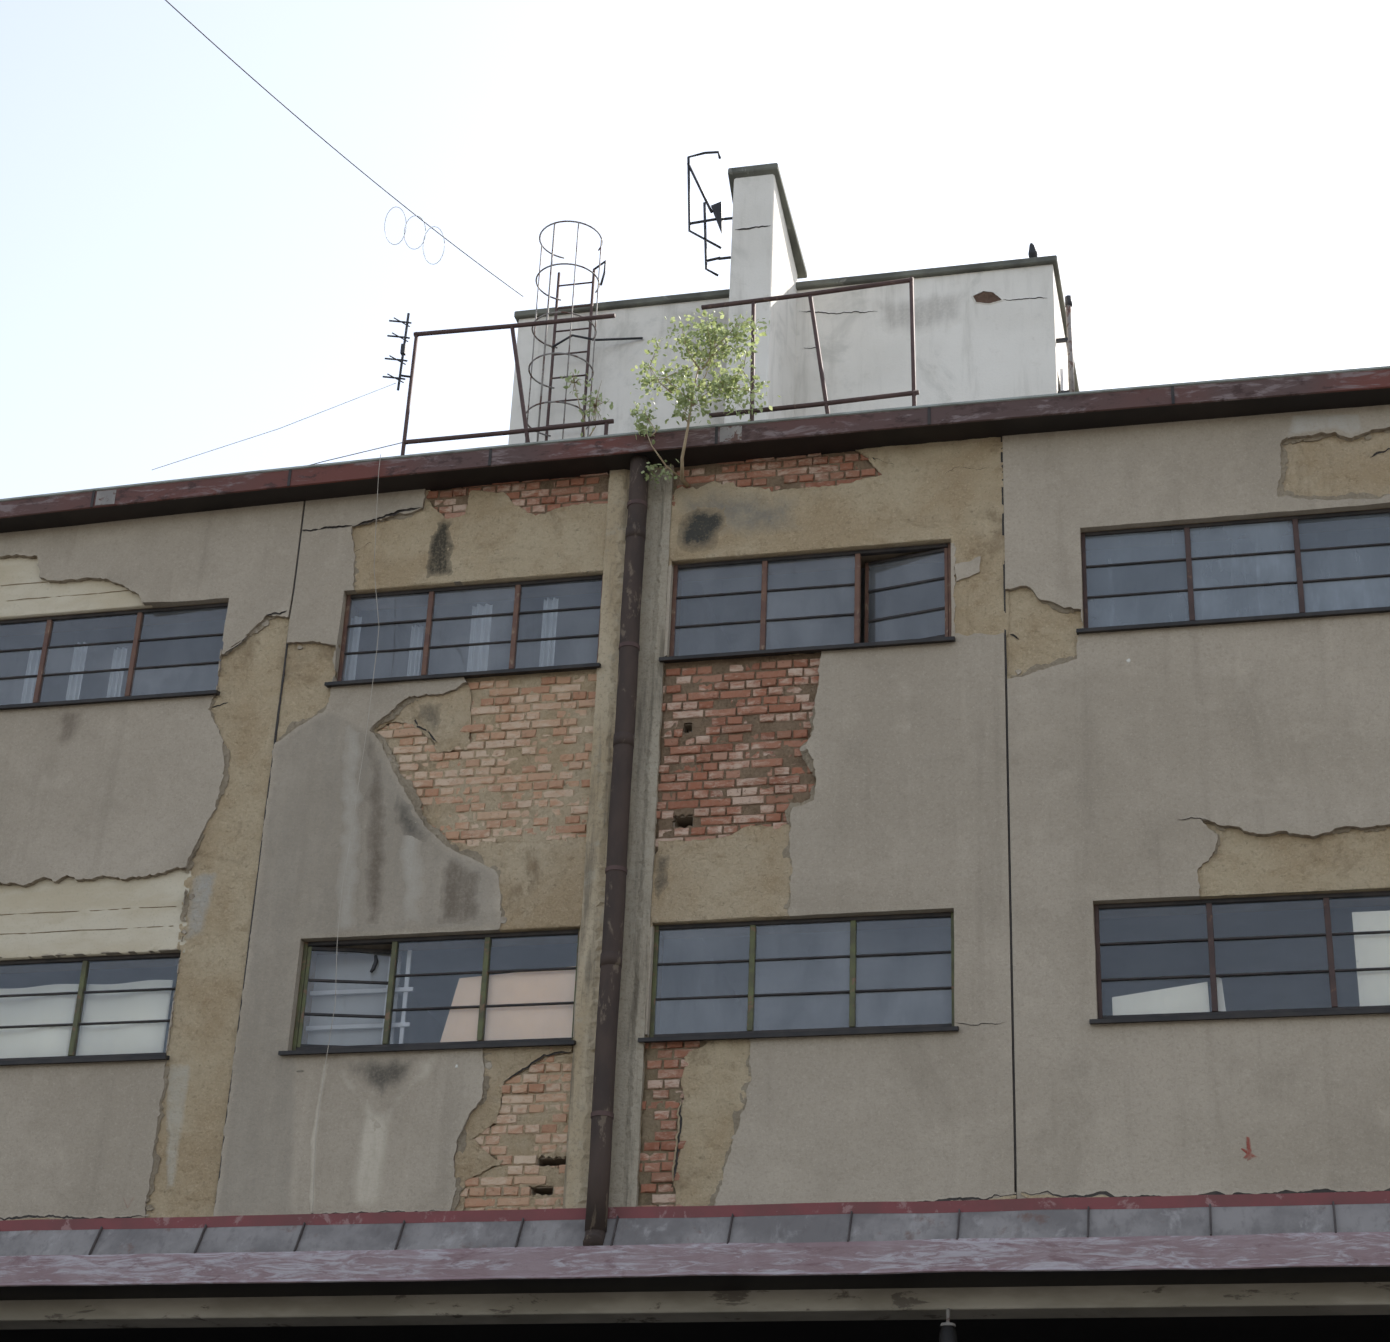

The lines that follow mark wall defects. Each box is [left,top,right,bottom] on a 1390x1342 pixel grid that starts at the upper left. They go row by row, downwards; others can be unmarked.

spalling [40,577,139,596]
flaking render [351,473,608,590]
water stain [673,481,803,553]
flaking render [672,453,882,506]
spalling [1005,586,1083,623]
spalling [1277,427,1390,488]
flaking render [370,674,597,846]
flaking render [655,659,820,847]
spalling [1197,819,1390,871]
water stain [213,711,500,1216]
flaking render [451,1047,572,1211]
flaking render [638,1034,707,1207]